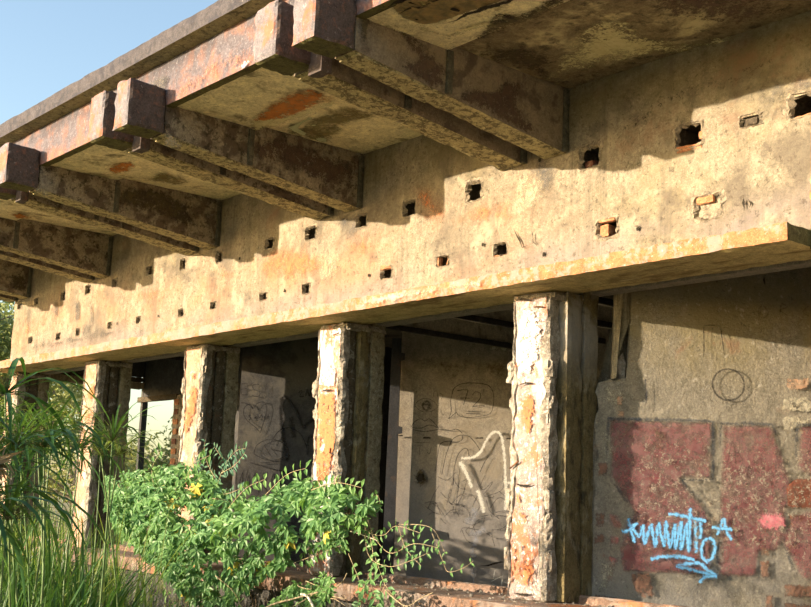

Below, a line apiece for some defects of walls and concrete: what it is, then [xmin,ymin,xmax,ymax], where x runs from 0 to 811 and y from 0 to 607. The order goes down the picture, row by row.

crack [388,0,438,15]
crack [448,0,514,23]
damp [421,0,565,39]
damp [392,28,444,87]
damp [481,19,689,78]
rust [251,89,334,130]
spalling [783,89,811,123]
spalling [672,119,706,154]
rust [109,162,134,173]
spalling [594,215,620,242]
peeling [311,327,350,490]
spalling [486,296,560,600]